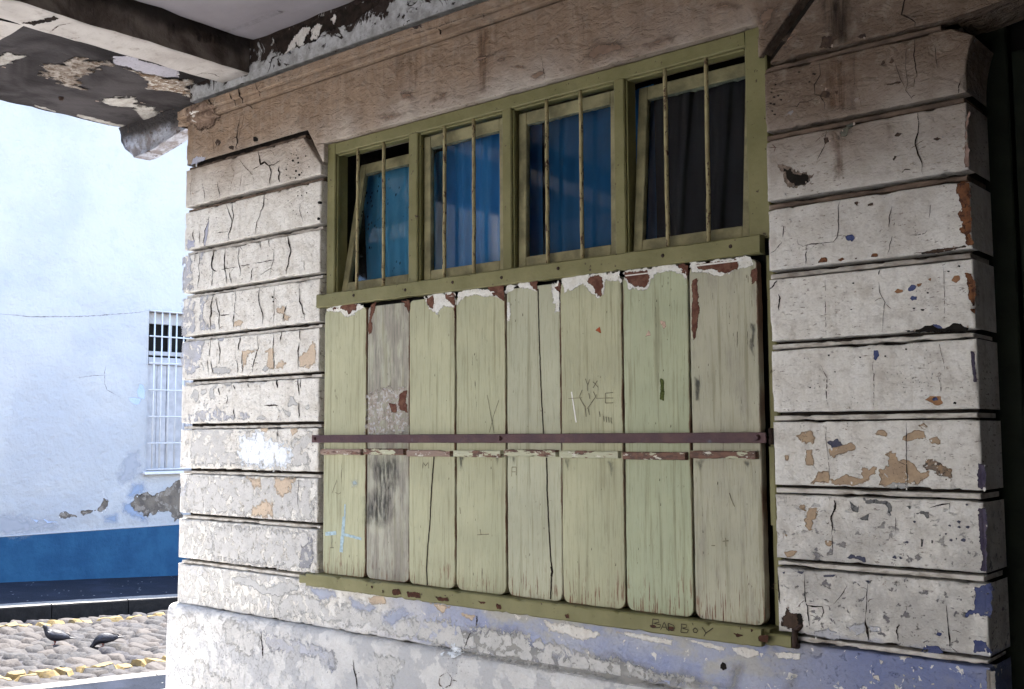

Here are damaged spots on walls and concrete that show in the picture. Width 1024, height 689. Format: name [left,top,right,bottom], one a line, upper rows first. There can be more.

peeling [272,0,380,55]
flaking render [0,52,26,68]
flaking render [38,56,221,132]
crack [895,0,938,170]
crack [190,56,305,436]
crack [771,202,847,262]
peeling [129,222,707,689]
peeling [796,428,952,490]
peeling [31,490,109,523]
peeling [850,498,892,520]
peeling [921,504,994,618]
peeling [922,632,943,654]